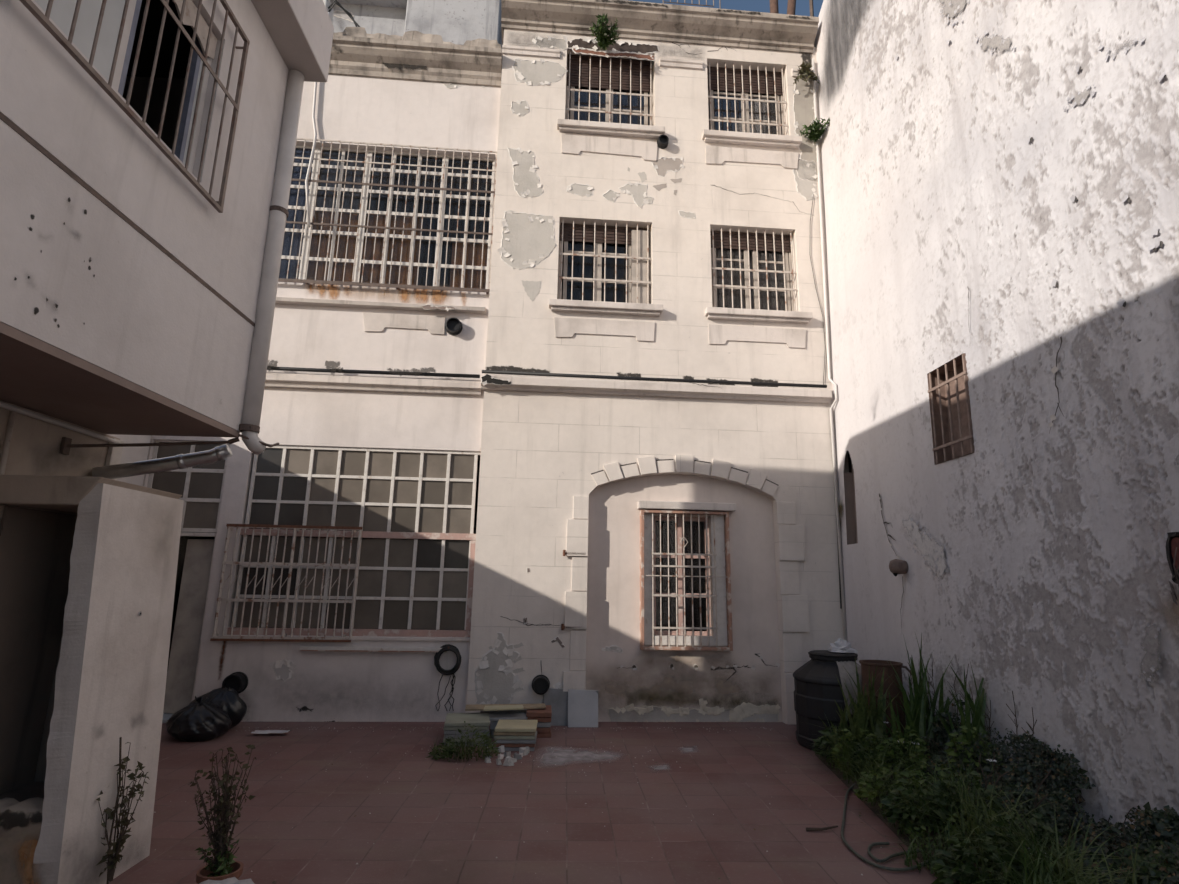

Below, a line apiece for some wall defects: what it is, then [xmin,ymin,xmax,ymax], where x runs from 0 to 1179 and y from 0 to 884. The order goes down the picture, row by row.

peeling [939,0,968,45]
peeling [512,35,659,86]
peeling [511,100,530,117]
peeling [793,78,818,201]
peeling [507,147,544,198]
peeling [566,157,684,209]
peeling [498,209,556,301]
corrosion [309,284,338,298]
corrosion [384,289,446,302]
peeling [474,632,524,704]
spalling [608,698,780,722]
corrosion [18,839,38,884]